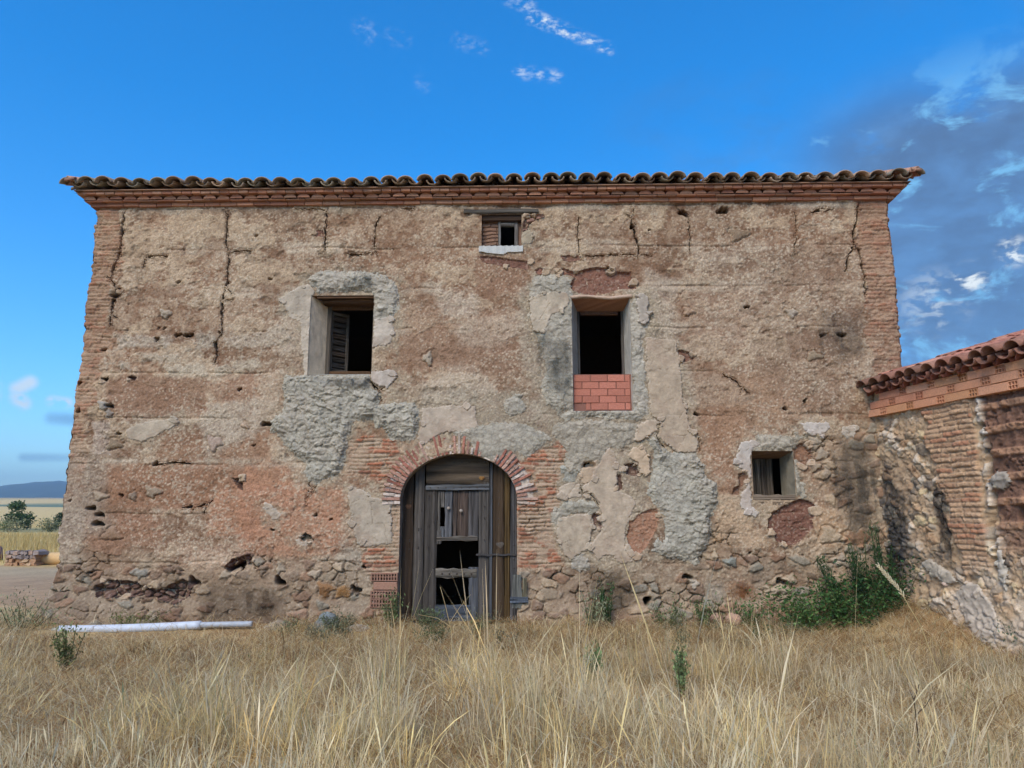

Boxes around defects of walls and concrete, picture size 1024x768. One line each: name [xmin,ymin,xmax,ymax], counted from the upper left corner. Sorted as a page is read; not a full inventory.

crack [106,210,169,327]
crack [212,207,253,365]
crack [576,208,653,261]
crack [793,200,868,296]
flaking render [371,369,398,389]
flaking render [478,252,698,564]
spalling [733,421,860,549]
spalling [94,578,198,605]
spalling [225,554,256,577]